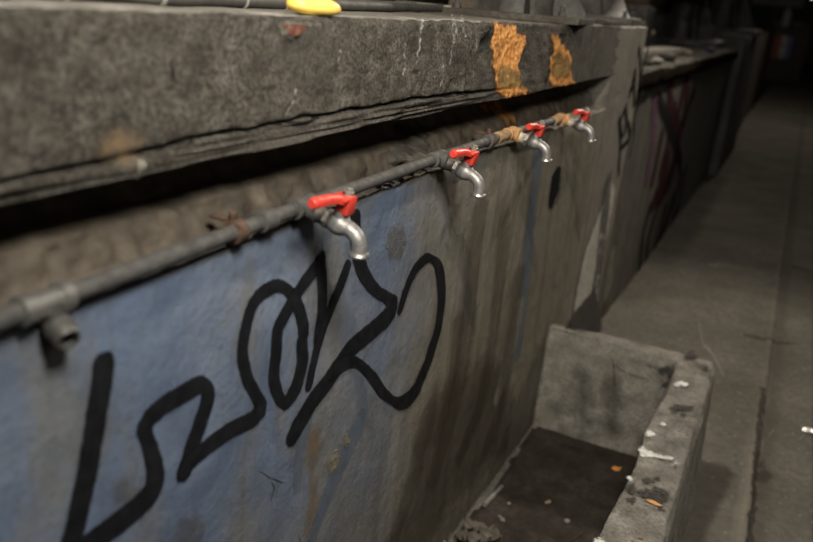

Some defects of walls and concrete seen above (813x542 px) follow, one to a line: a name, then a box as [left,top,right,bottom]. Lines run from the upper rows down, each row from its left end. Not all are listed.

rust [478,21,536,144]
rust [549,34,576,87]
leakage [536,126,574,343]